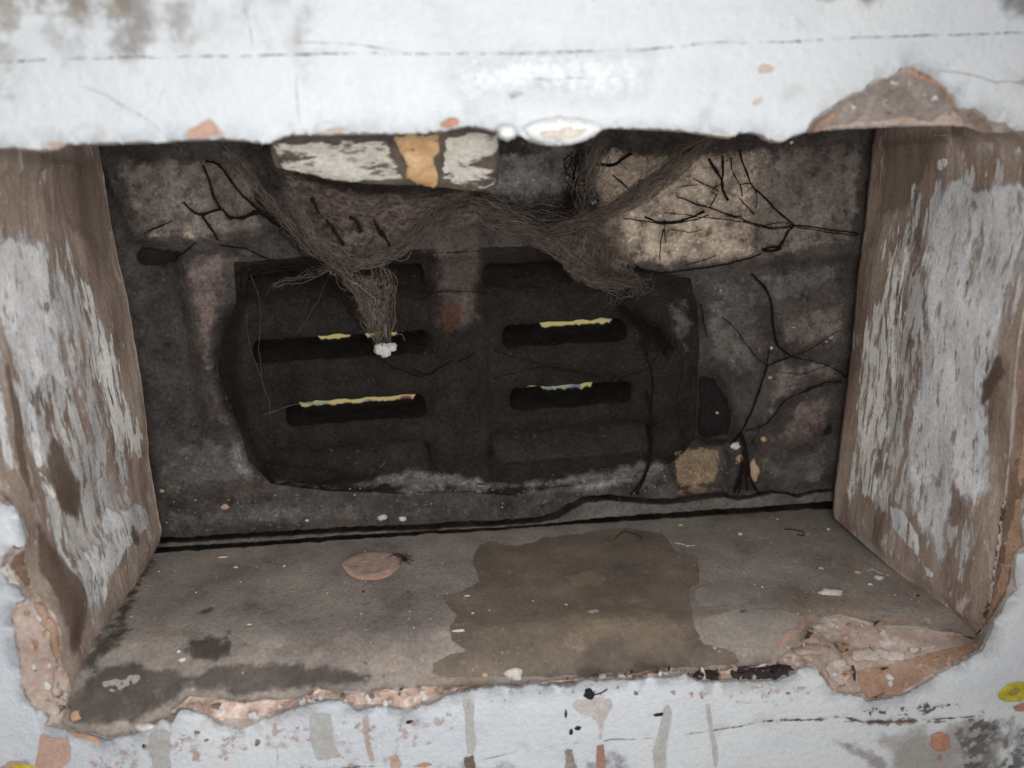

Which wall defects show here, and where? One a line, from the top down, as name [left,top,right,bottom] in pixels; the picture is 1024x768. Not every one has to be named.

spalling [808,68,993,133]
peeling [273,118,498,189]
peeling [847,158,1024,626]
peeling [0,218,149,724]
spalling [342,550,400,580]
leakage [433,528,804,677]
leakage [69,664,370,724]
spalling [171,685,479,721]
spalling [505,617,979,700]
peeling [1,730,101,768]